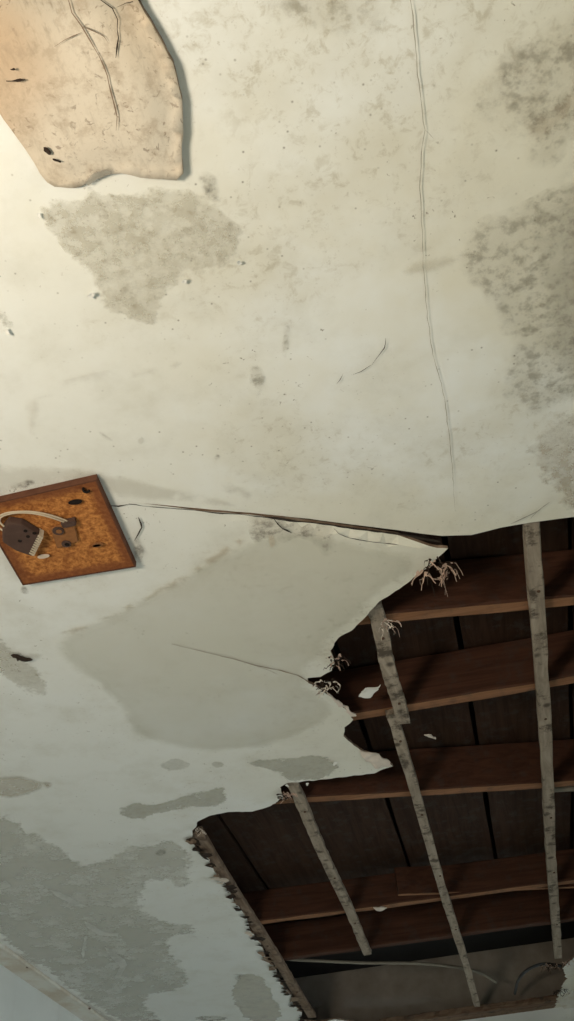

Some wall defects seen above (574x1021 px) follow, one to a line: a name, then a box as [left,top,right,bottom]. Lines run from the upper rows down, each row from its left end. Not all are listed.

crack [56,0,141,128]
crack [410,0,455,504]
crack [111,504,440,545]
flaking render [329,693,356,717]
flaking render [359,685,381,698]
peeling [251,756,338,787]
flaking render [360,750,391,769]
peeling [185,837,308,1021]